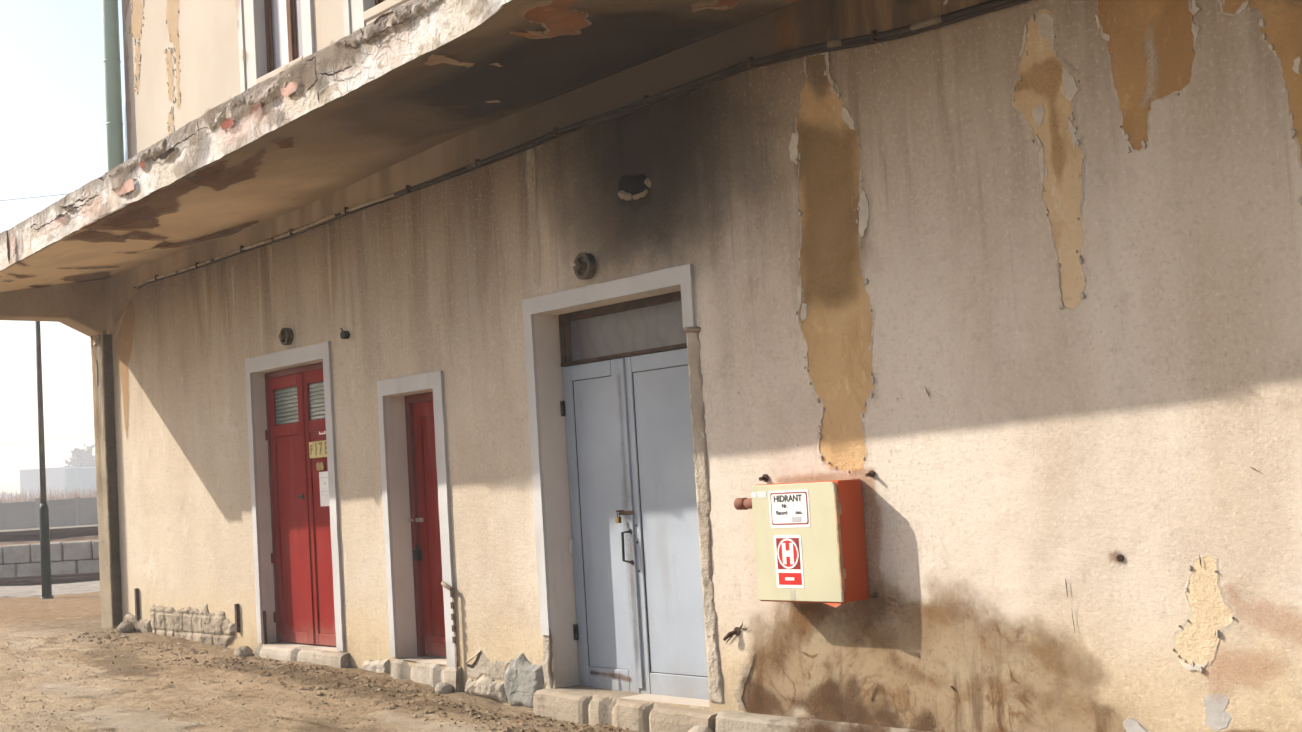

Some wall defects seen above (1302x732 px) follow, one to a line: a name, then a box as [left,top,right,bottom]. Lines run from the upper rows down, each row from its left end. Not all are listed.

crack [7,189,103,264]
peeling [99,0,181,199]
leakage [0,101,294,288]
crack [147,119,209,161]
spalling [208,62,307,134]
crack [305,16,413,103]
spalling [335,0,443,50]
flaking render [789,52,878,475]
flaking render [1008,3,1091,311]
flaking render [1095,0,1202,153]
leakage [743,583,1126,732]
flaking render [1172,552,1238,673]